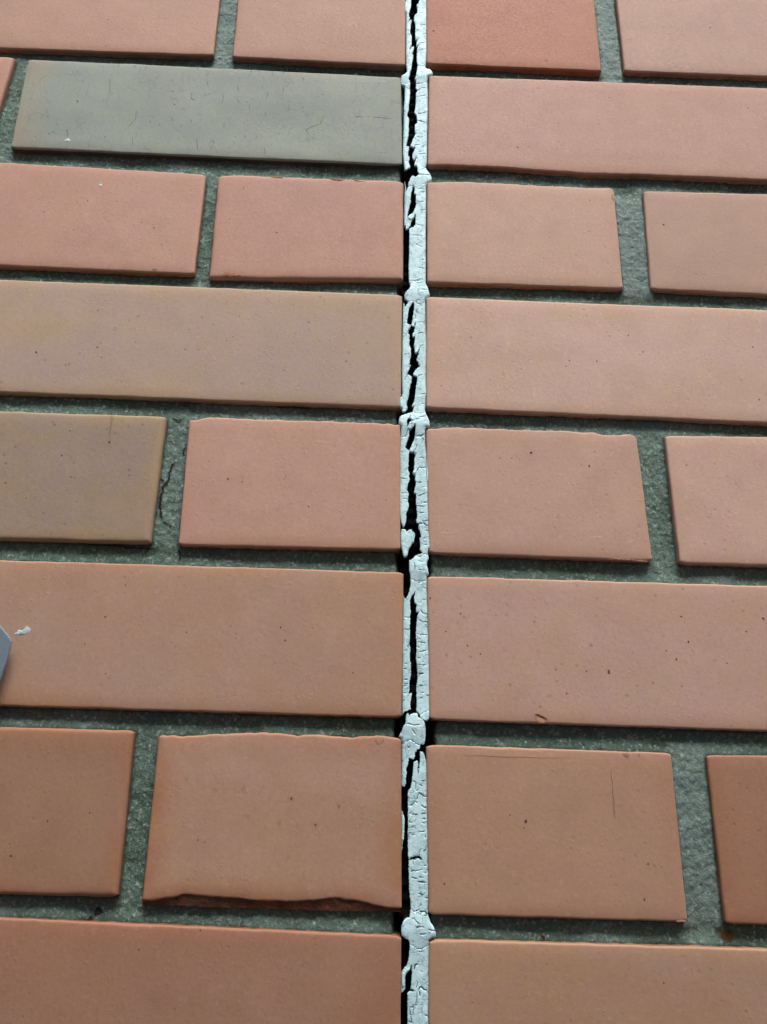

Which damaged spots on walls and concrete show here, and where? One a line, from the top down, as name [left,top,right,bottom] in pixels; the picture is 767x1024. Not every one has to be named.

crack [87,447,186,560]
crack [397,0,435,1024]